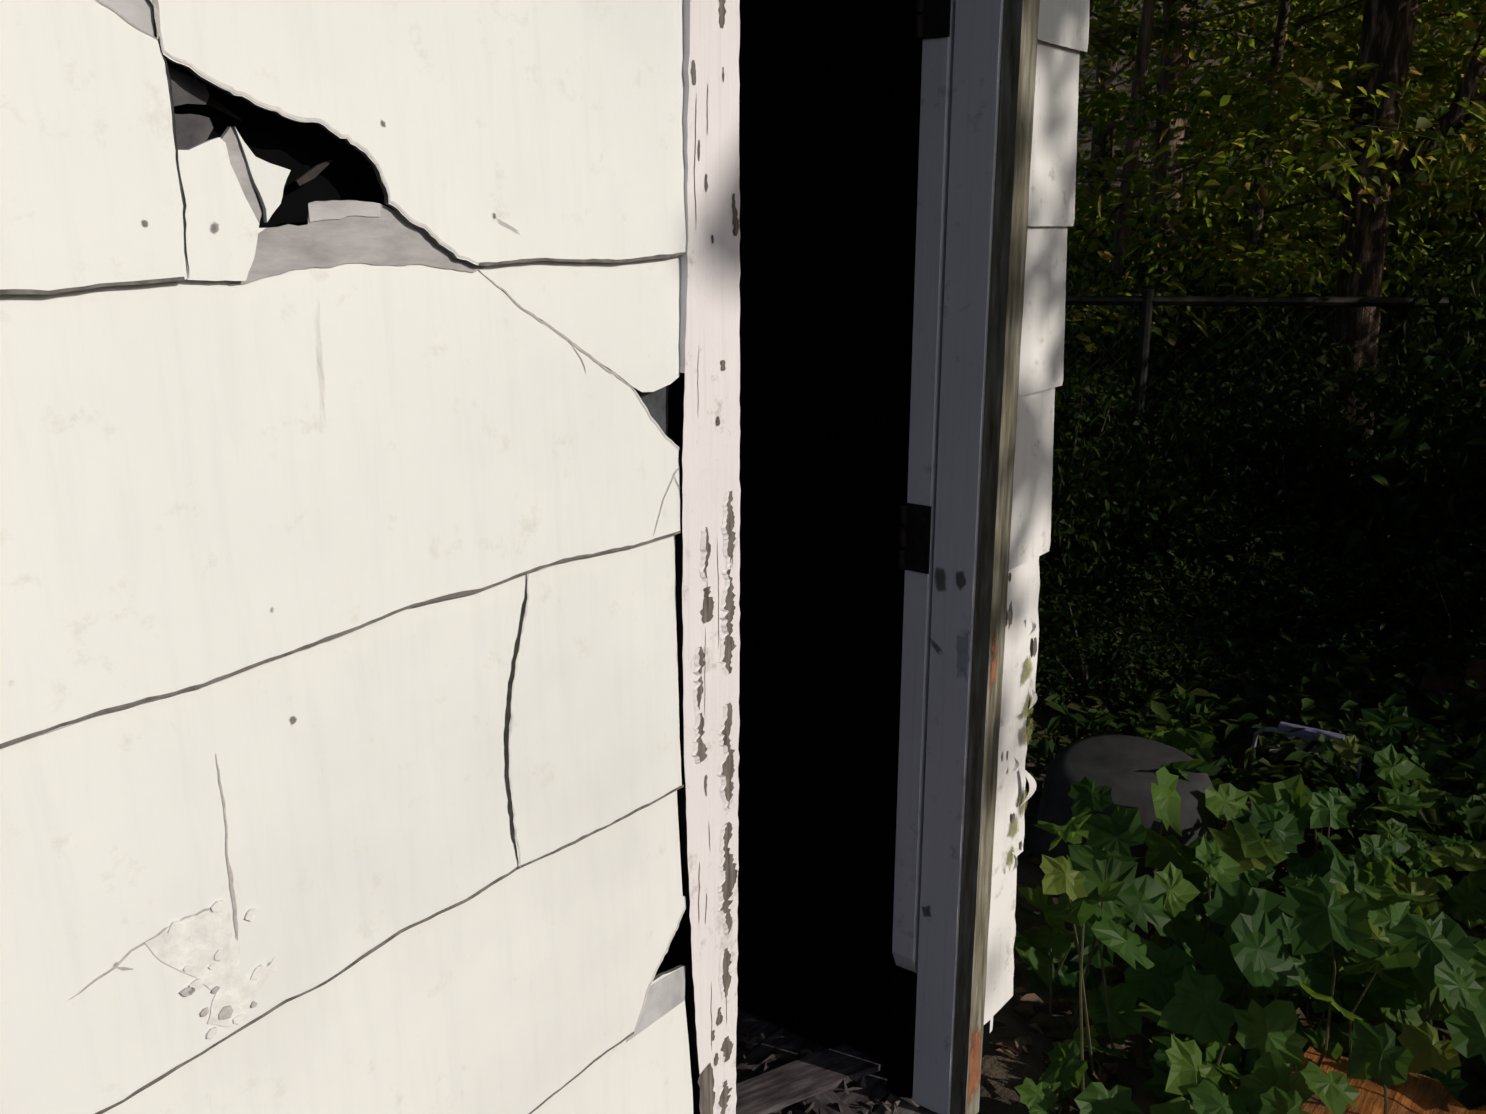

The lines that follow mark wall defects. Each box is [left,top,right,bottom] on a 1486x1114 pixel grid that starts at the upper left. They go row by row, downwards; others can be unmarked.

spalling [97,0,484,286]
peeling [691,60,724,206]
crack [479,270,631,387]
crack [69,756,238,1000]
peeling [179,949,257,1039]
crack [504,574,530,867]
peeling [627,491,738,1114]